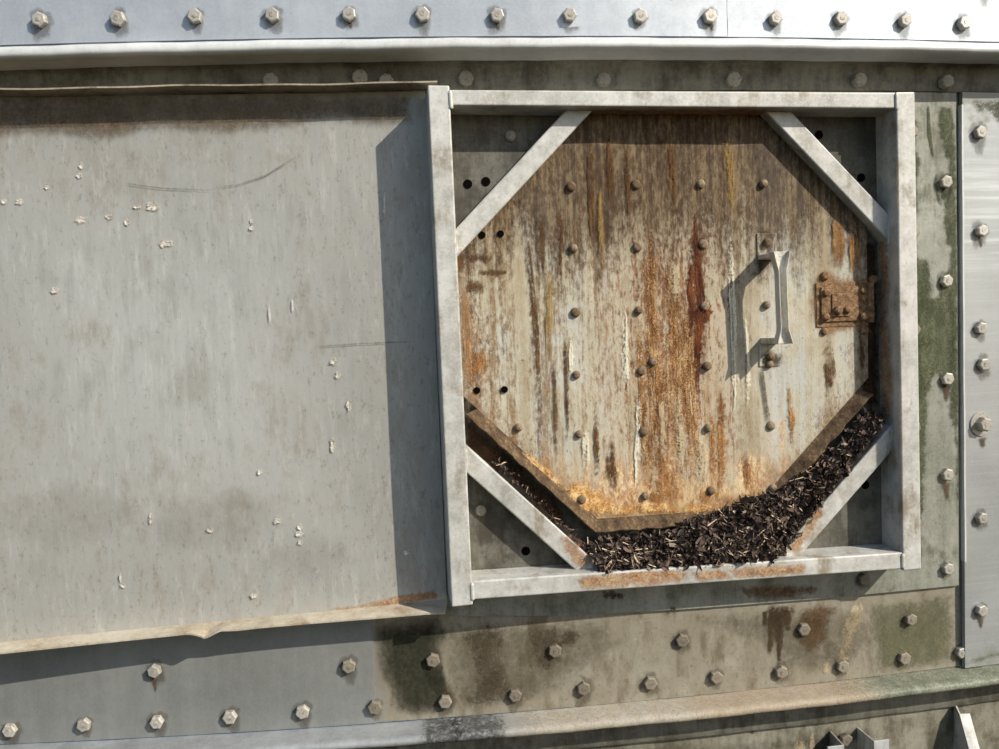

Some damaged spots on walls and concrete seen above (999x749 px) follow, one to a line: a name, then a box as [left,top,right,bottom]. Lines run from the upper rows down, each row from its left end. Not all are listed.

leakage [976,101,999,122]
leakage [934,177,952,201]
rust [468,425,588,565]
rust [525,221,544,437]
rust [553,343,570,455]
rust [593,415,618,488]
rust [634,214,728,504]
rust [814,222,892,417]
leakage [430,668,444,693]
leakage [466,626,510,703]
leakage [511,603,878,736]
rust [580,565,831,661]